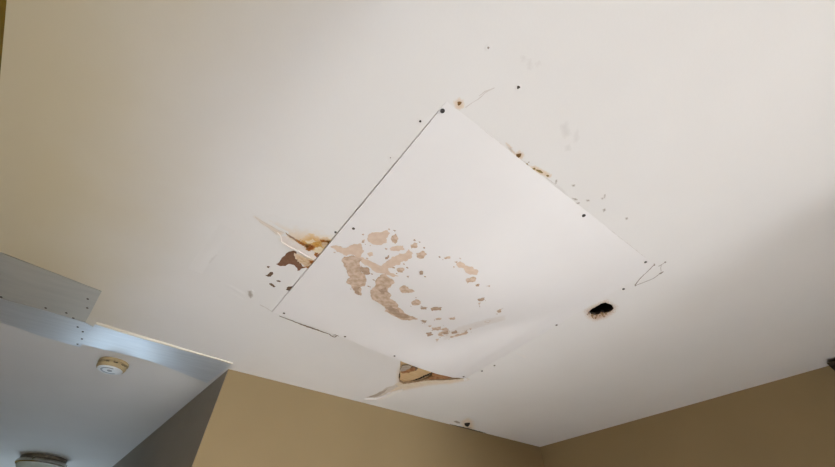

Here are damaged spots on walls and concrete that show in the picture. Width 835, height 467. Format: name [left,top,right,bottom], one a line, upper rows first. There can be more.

rust [453,97,465,110]
rust [505,143,552,178]
rust [296,239,330,269]
peeling [266,229,472,341]
hole [584,299,619,322]
spalling [392,361,467,391]